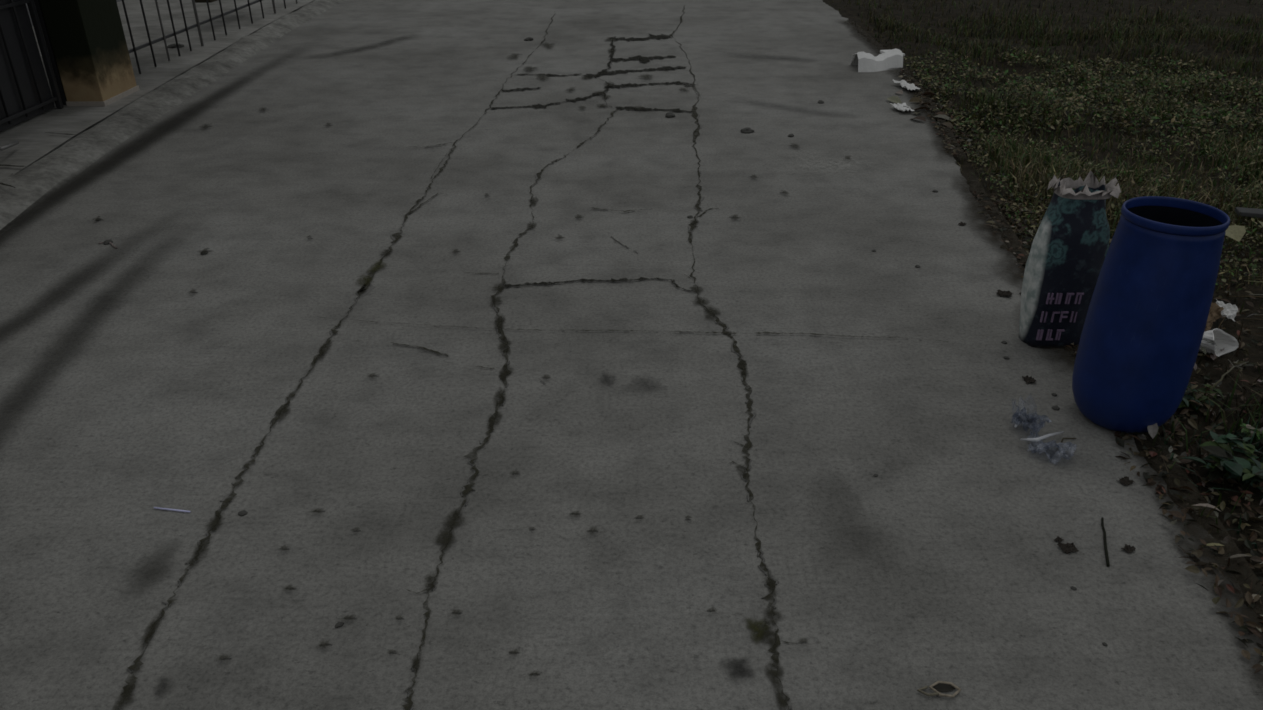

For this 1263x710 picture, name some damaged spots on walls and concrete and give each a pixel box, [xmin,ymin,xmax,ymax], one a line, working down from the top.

crack [114,8,950,710]